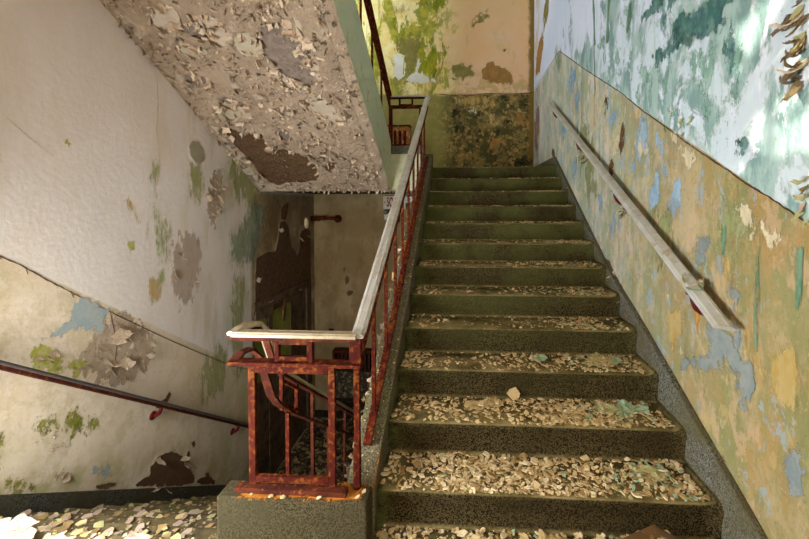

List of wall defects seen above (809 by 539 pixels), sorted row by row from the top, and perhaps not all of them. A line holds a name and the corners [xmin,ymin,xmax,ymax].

spalling [393,33,436,84]
spalling [449,62,513,85]
peeling [767,0,809,102]
spalling [103,0,396,311]
peeling [735,136,749,156]
peeling [733,202,781,250]
peeling [790,176,809,226]
peeling [30,297,157,387]
peeling [675,280,756,416]
spalling [132,441,216,494]
corrosion [236,458,379,502]
peeling [784,445,806,503]